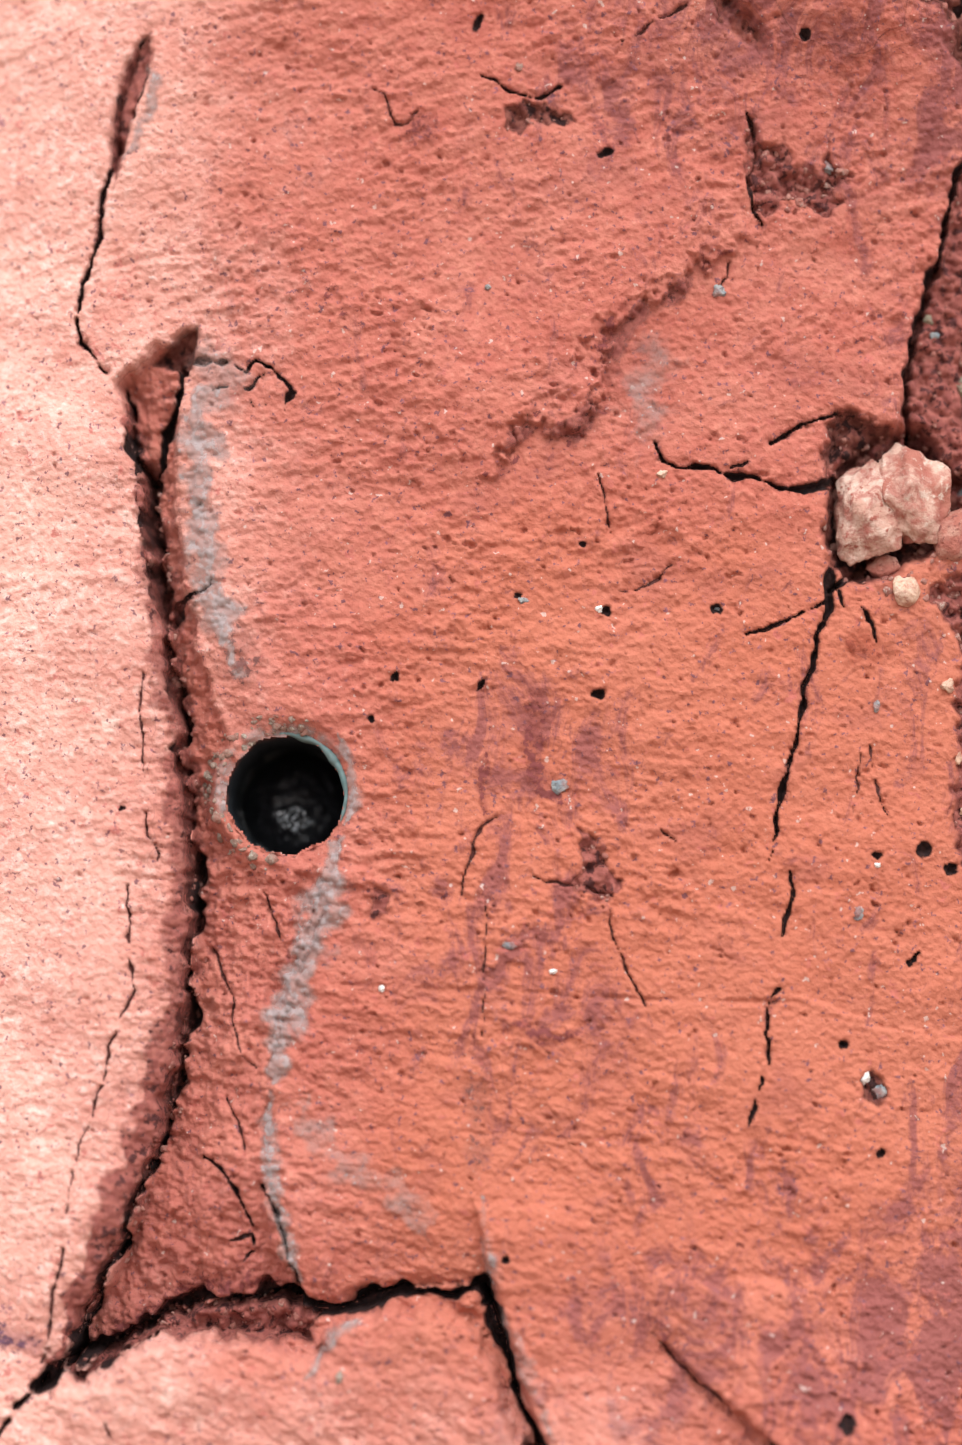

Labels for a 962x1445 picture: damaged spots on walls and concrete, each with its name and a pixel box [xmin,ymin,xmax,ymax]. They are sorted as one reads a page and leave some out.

crack [481,75,562,100]
crack [746,112,763,226]
crack [901,162,962,445]
crack [598,475,610,527]
crack [654,411,838,494]
crack [621,564,672,592]
crack [0,33,546,1445]
crack [745,567,877,936]
crack [537,878,646,1005]
crack [748,987,781,1126]
crack [652,1332,732,1413]